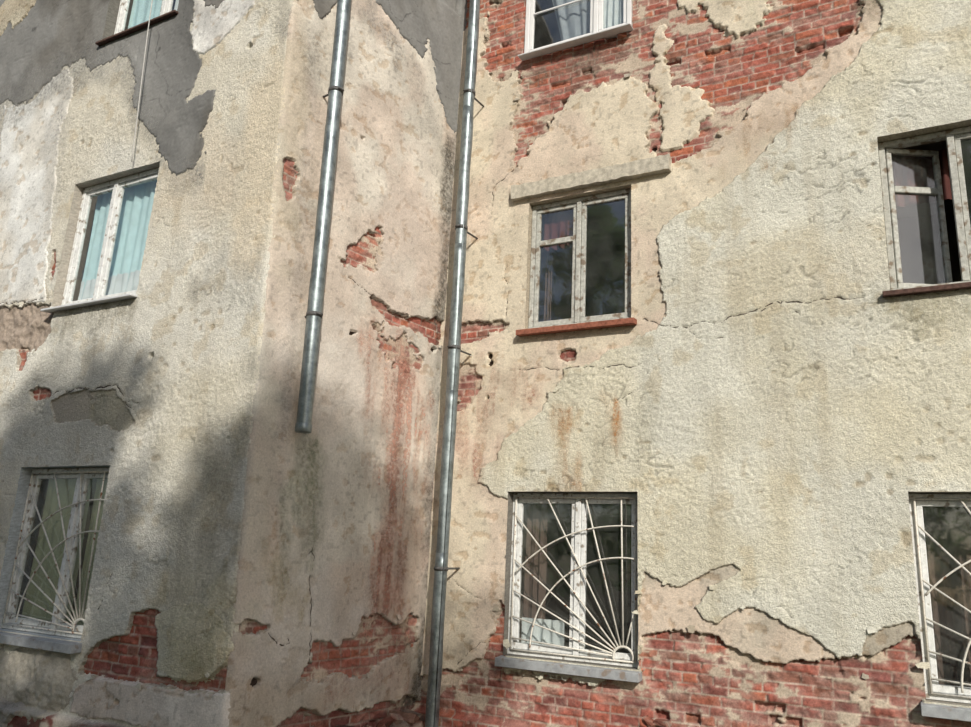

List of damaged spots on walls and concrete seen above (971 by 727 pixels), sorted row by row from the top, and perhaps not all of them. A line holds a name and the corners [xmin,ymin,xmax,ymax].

peeling [0,0,36,36]
peeling [190,0,255,55]
peeling [0,68,74,371]
peeling [277,0,971,727]
peeling [33,387,135,431]
spalling [238,619,267,635]
peeling [69,609,231,727]